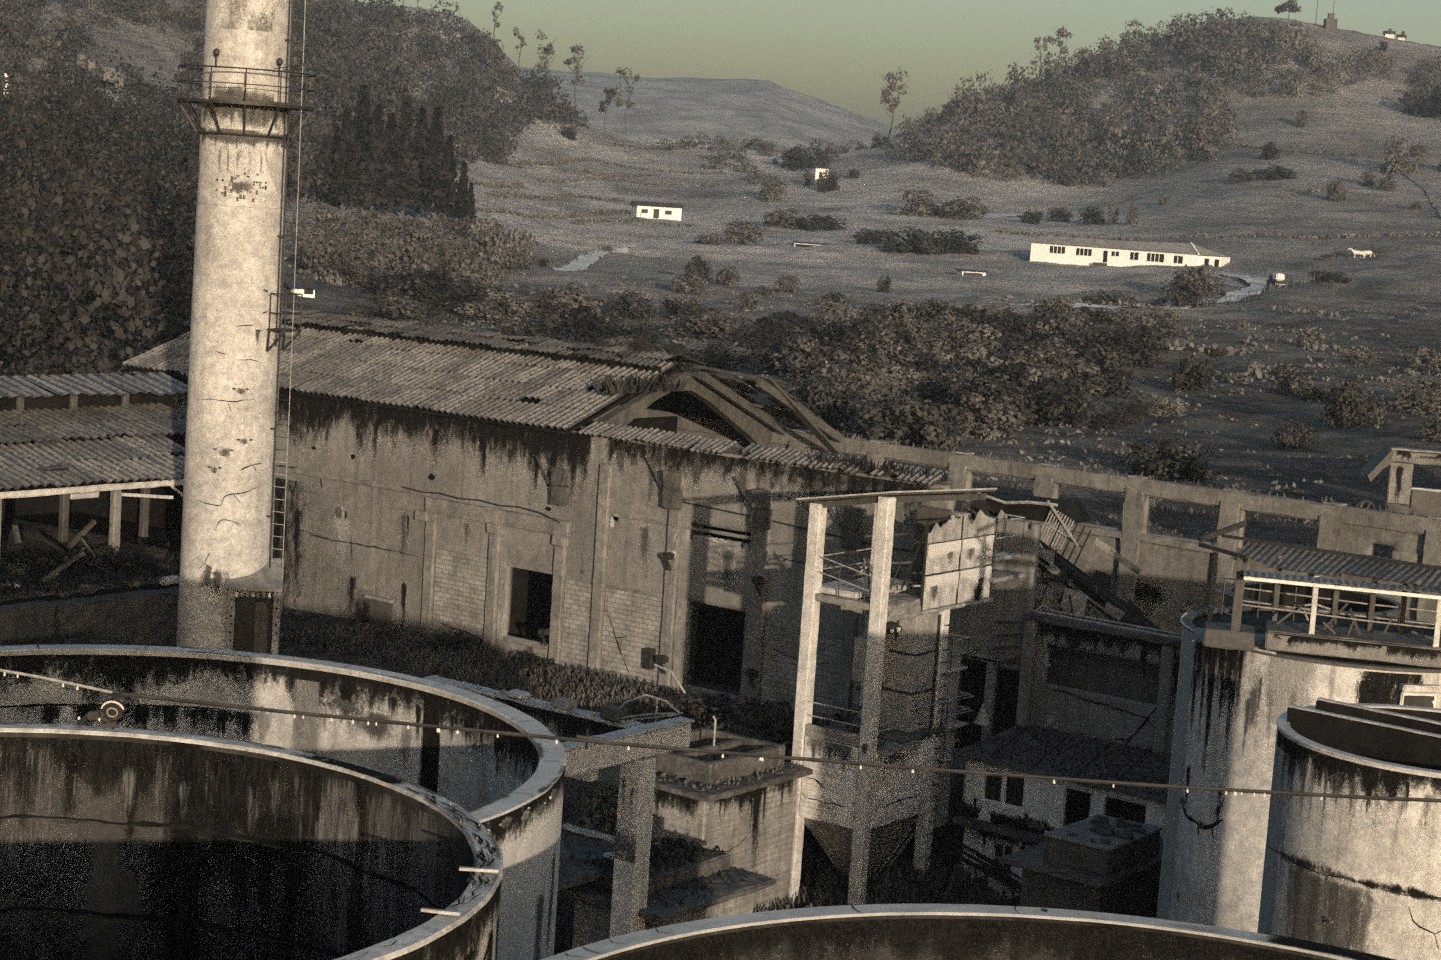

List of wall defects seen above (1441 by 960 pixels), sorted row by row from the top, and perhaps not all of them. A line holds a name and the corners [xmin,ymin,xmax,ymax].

leakage [143,372,188,405]
leakage [278,392,591,493]
leakage [608,439,930,514]
leakage [0,655,626,960]
leakage [609,621,1441,960]